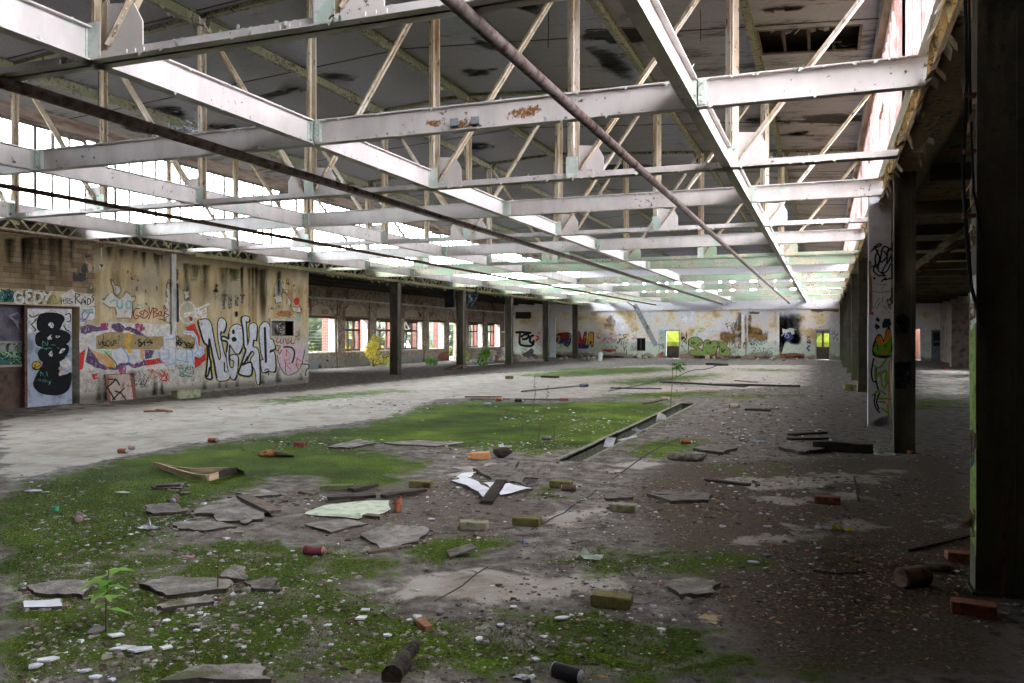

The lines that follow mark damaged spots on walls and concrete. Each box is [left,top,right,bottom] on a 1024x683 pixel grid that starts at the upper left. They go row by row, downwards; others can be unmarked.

water stain [586,46,631,78]
corrosion [508,105,542,119]
water stain [6,237,74,264]
water stain [185,264,209,300]
water stain [224,267,281,312]
water stain [694,313,804,359]